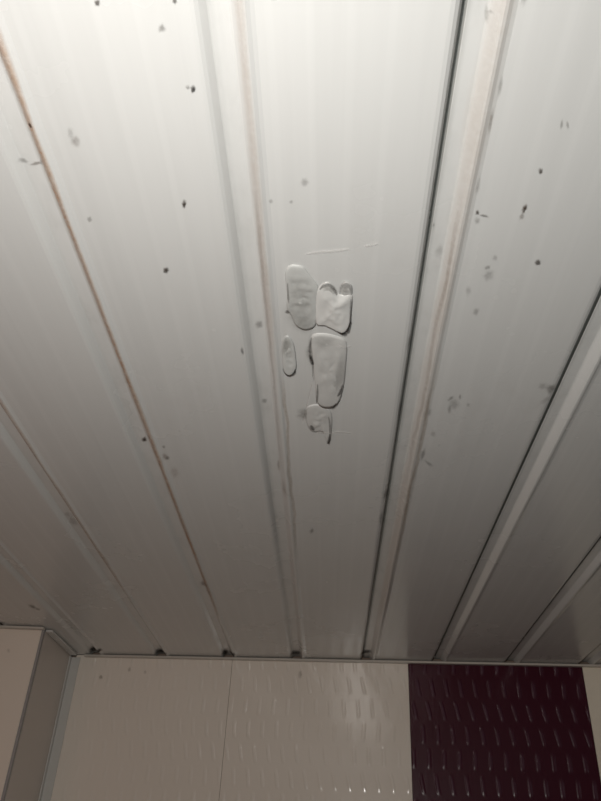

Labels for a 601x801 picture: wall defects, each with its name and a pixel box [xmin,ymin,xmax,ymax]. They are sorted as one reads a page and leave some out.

peeling [282,259,357,446]